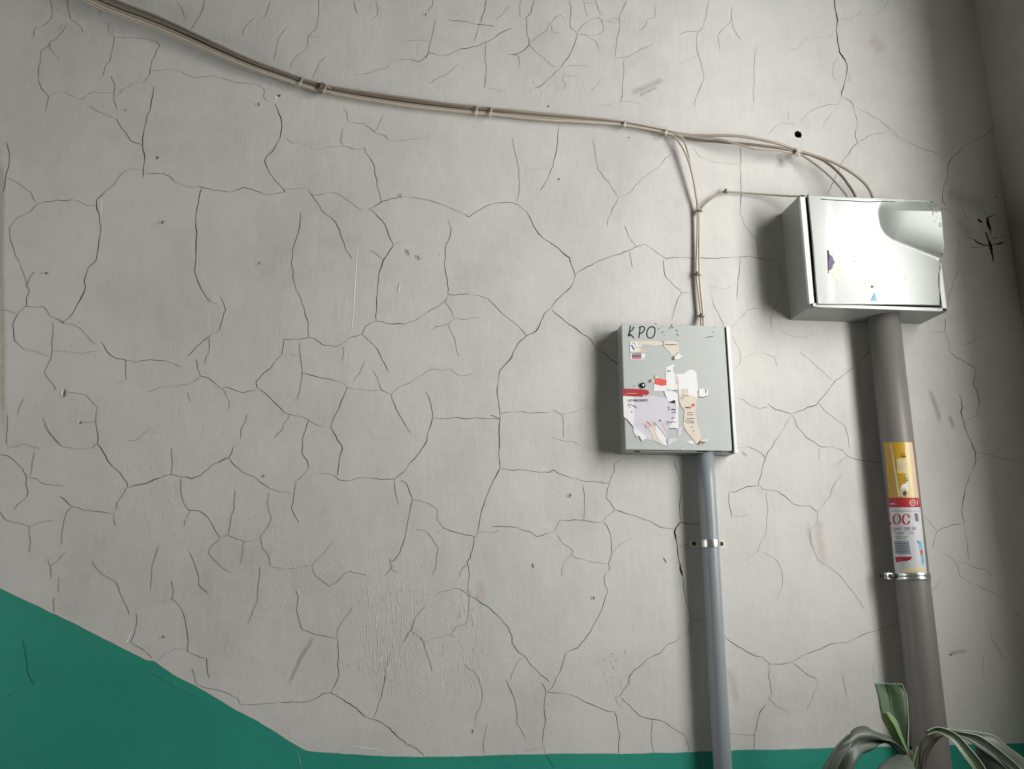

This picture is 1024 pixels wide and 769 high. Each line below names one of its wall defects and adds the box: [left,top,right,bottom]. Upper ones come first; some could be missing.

crack [359,2,655,106]
crack [681,6,756,105]
crack [0,37,782,766]
crack [729,334,878,599]
crack [773,0,1019,614]
crack [725,623,896,750]